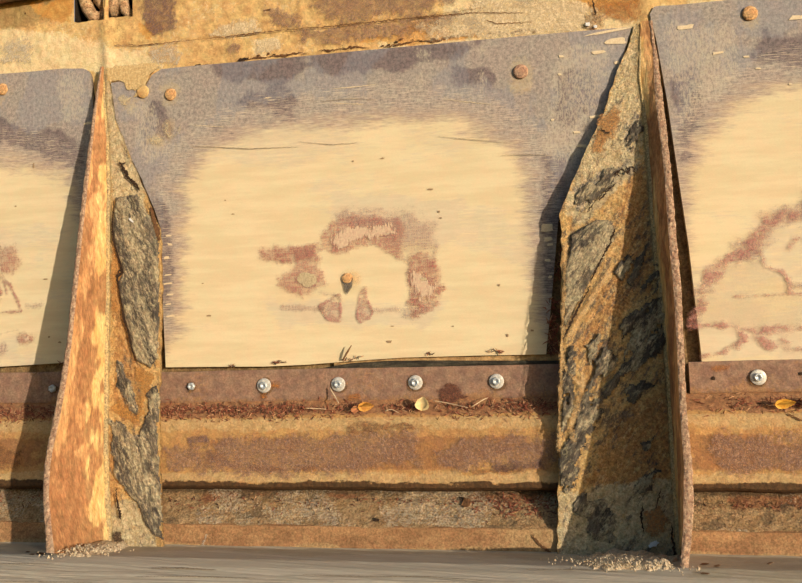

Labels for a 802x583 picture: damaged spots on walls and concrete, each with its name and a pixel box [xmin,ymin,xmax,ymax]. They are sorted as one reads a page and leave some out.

corrosion [143,0,177,35]
corrosion [269,0,460,44]